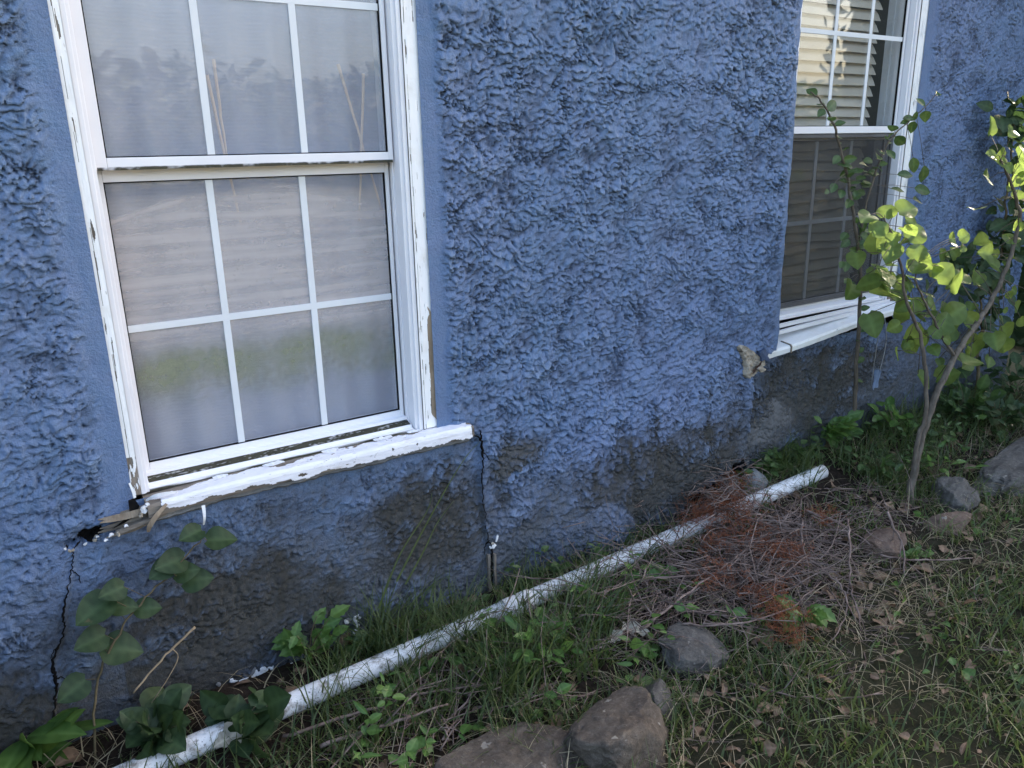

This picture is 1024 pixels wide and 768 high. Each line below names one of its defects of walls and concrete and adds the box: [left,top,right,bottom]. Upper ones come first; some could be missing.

peeling [47,0,473,525]
spalling [737,345,770,379]
damp [377,463,485,574]
crack [474,430,494,591]
damp [493,438,540,496]
crack [50,532,85,718]